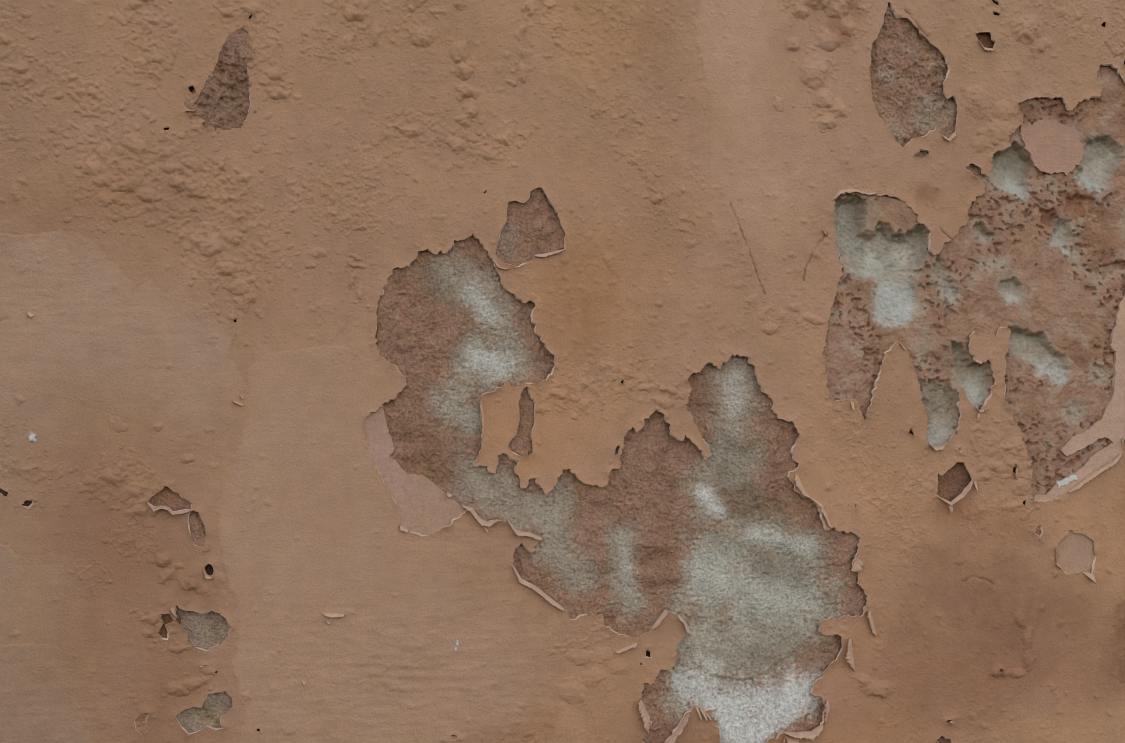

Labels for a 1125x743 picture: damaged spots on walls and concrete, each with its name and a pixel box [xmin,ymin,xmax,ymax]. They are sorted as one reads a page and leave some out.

peeling [184,15,256,136]
peeling [869,3,957,158]
flaking render [976,33,994,51]
spalling [822,61,1125,505]
peeling [147,486,214,580]
spalling [363,188,877,743]
peeling [937,463,978,513]
peeling [1056,530,1097,584]
peeling [159,606,230,650]
peeling [176,692,232,733]